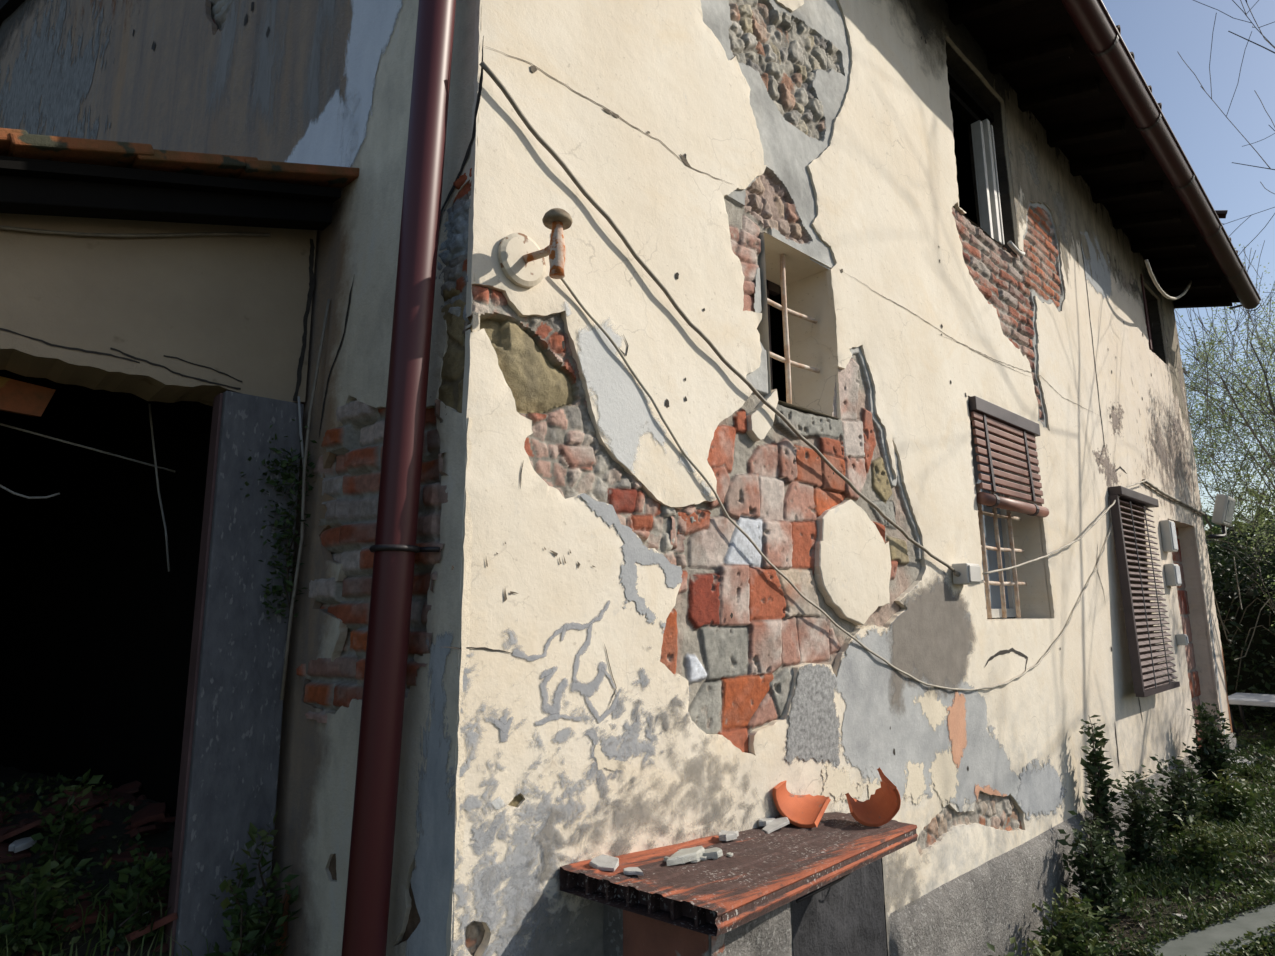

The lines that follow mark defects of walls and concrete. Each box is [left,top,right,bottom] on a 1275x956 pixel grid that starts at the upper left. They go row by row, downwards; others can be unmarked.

crack [0,328,242,390]
crack [439,36,734,229]
spalling [700,0,850,313]
crack [841,248,1126,473]
water stain [898,0,1201,529]
spalling [296,398,386,723]
spalling [397,168,1067,956]
crack [984,648,1028,671]
water stain [451,688,780,956]
water stain [883,851,920,955]